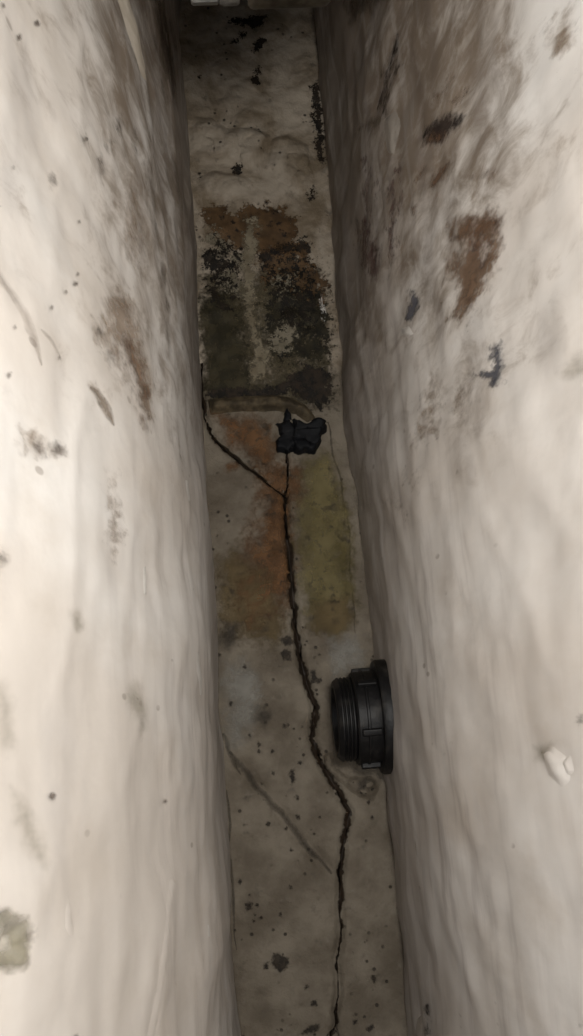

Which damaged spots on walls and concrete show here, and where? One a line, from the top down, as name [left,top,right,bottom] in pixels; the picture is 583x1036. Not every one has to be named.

damp [197,216,338,412]
corrosion [219,414,301,628]
crack [201,363,355,1036]